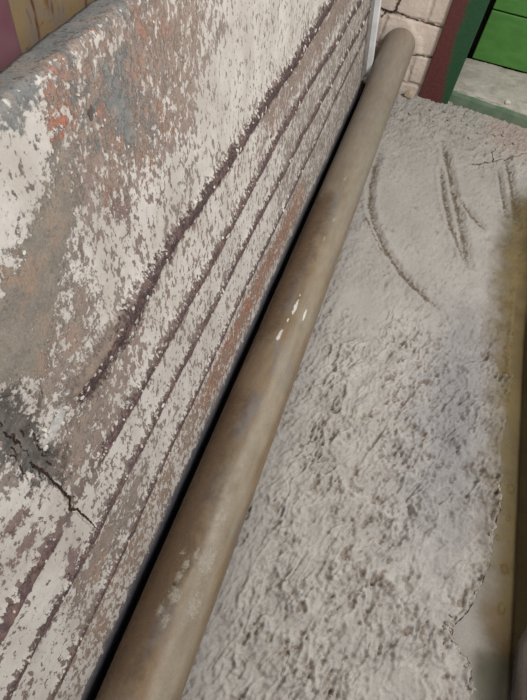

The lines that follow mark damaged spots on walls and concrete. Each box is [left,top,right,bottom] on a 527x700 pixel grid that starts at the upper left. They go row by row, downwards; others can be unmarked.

peeling [256,0,352,139]
efflorescence [39,375,73,451]
crack [30,462,99,532]
peeling [0,0,205,573]
peeling [59,443,156,631]
rust [0,0,371,700]
peeling [193,193,297,421]